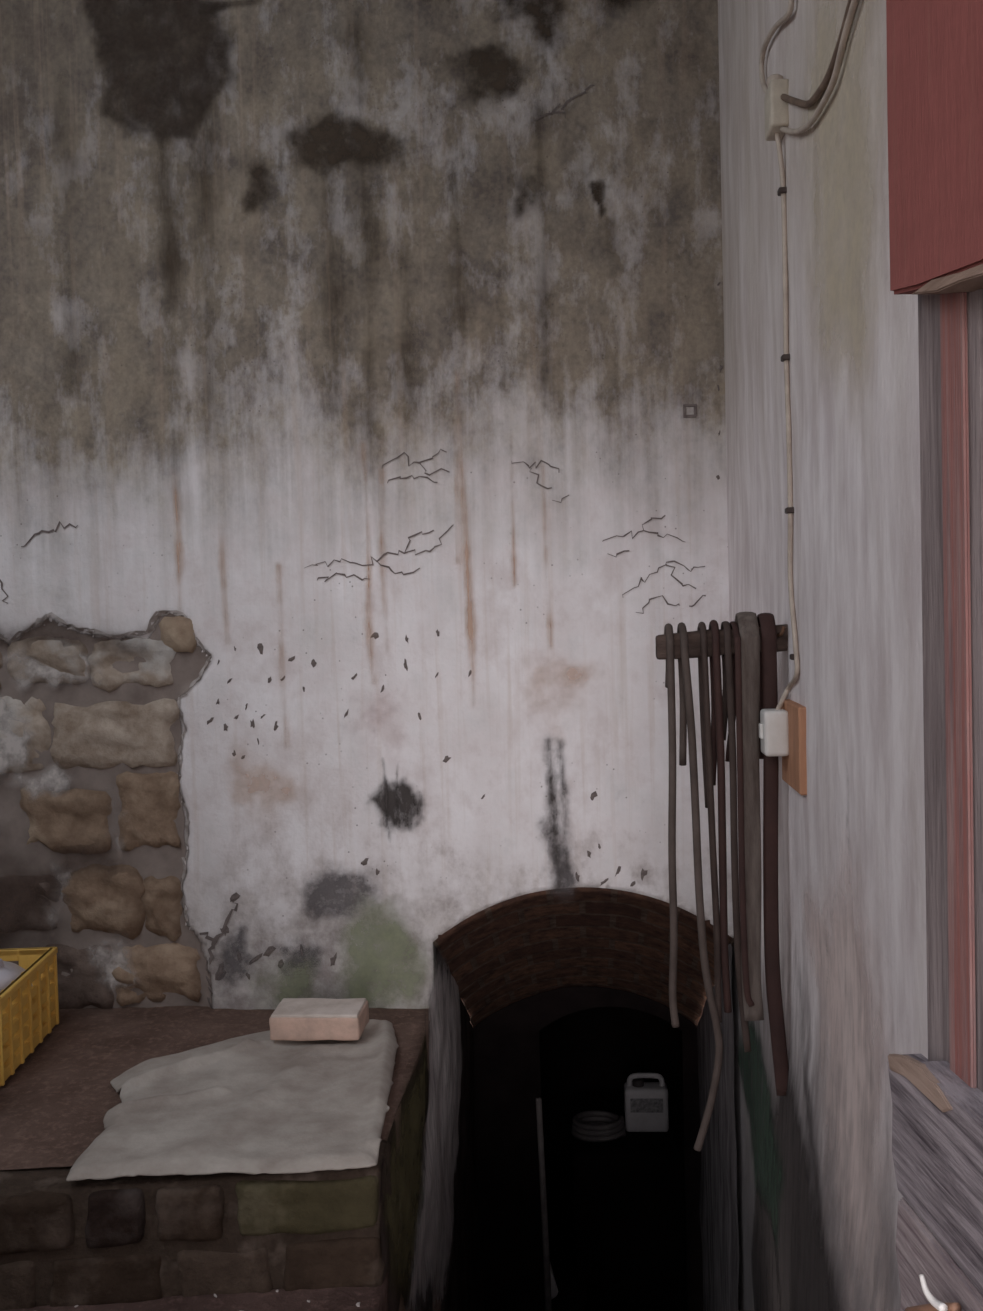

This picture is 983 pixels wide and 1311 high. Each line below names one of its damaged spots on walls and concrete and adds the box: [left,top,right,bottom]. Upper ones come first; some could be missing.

damp [85,0,233,217]
damp [290,114,400,173]
crack [382,449,449,483]
crack [511,460,569,503]
crack [21,521,78,547]
crack [305,525,453,582]
corrosion [465,544,473,640]
crack [602,515,706,614]
flaking render [0,610,284,1009]
damp [371,778,422,829]
damp [544,767,575,890]
damp [306,874,371,917]